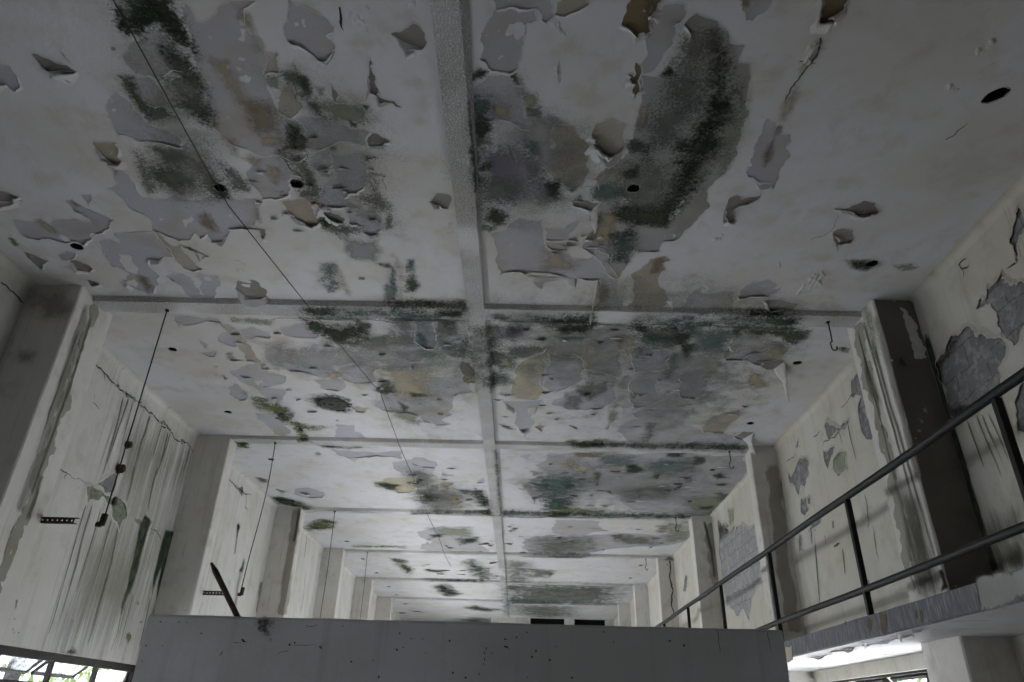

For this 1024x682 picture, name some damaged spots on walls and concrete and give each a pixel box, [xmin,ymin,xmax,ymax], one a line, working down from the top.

water stain [108,0,216,128]
peeling [13,0,384,299]
crack [785,38,822,102]
crack [62,325,193,452]
water stain [116,416,173,644]
water stain [274,217,603,422]
mould [458,535,621,623]
water stain [375,438,746,568]
peeling [416,0,792,622]
spalling [788,437,836,553]
peeling [823,322,916,595]
peeling [873,268,1024,610]